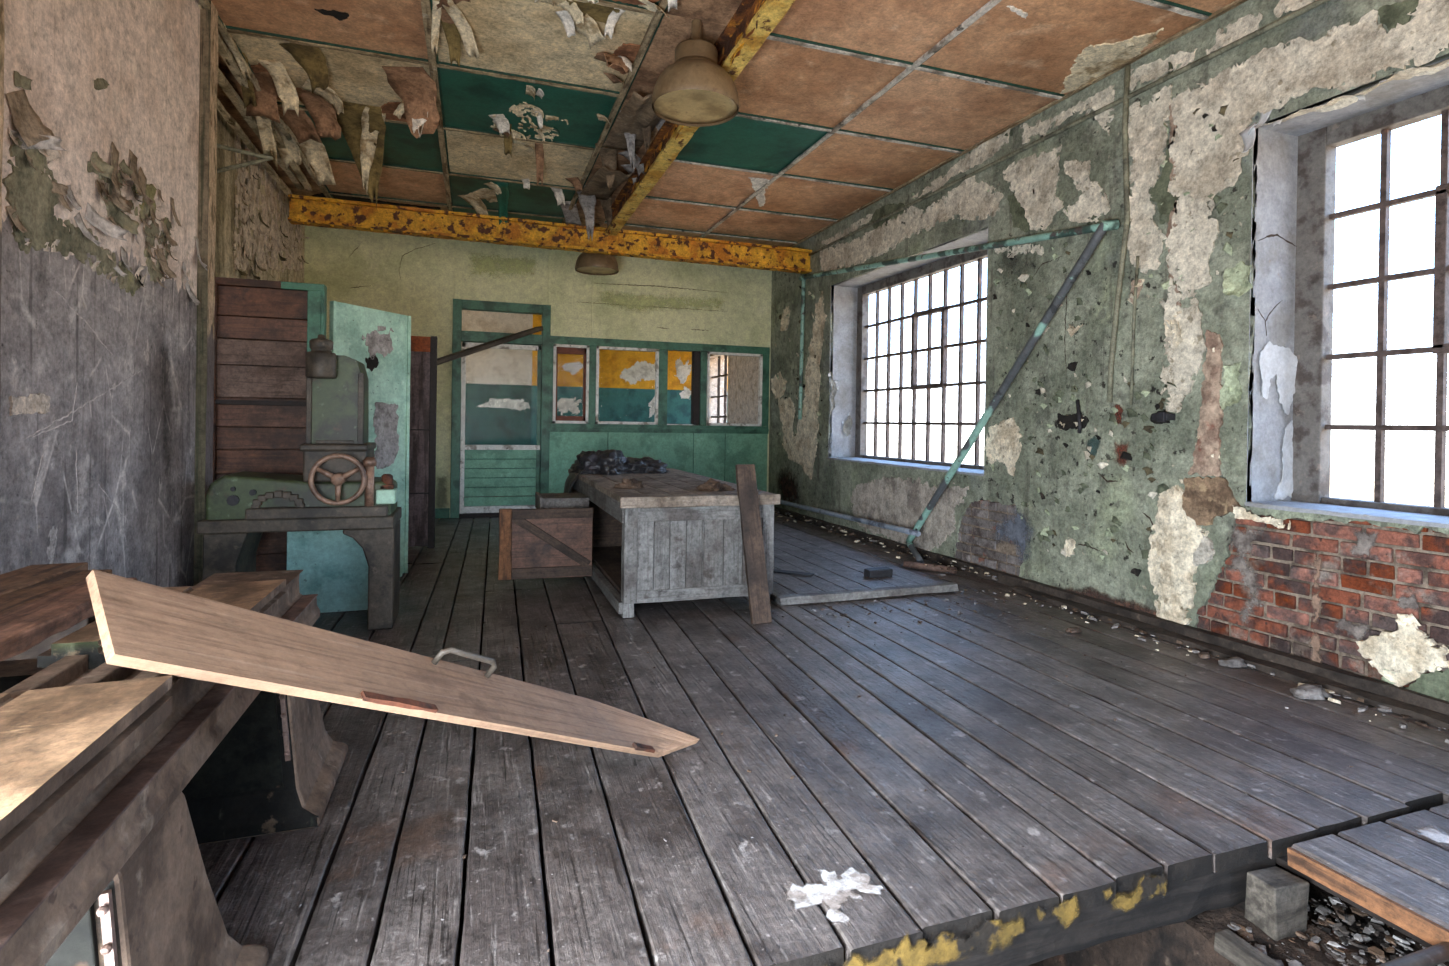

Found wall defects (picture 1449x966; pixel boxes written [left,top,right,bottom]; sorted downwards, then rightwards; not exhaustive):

peeling [431,0,480,67]
peeling [534,0,677,85]
corrosion [718,0,765,67]
peeling [2,71,208,305]
peeling [218,23,441,280]
peeling [370,85,568,247]
peeling [557,397,582,415]
peeling [562,361,583,375]
peeling [620,361,655,418]
peeling [674,357,692,400]
peeling [721,263,853,479]
peeling [819,0,1449,702]